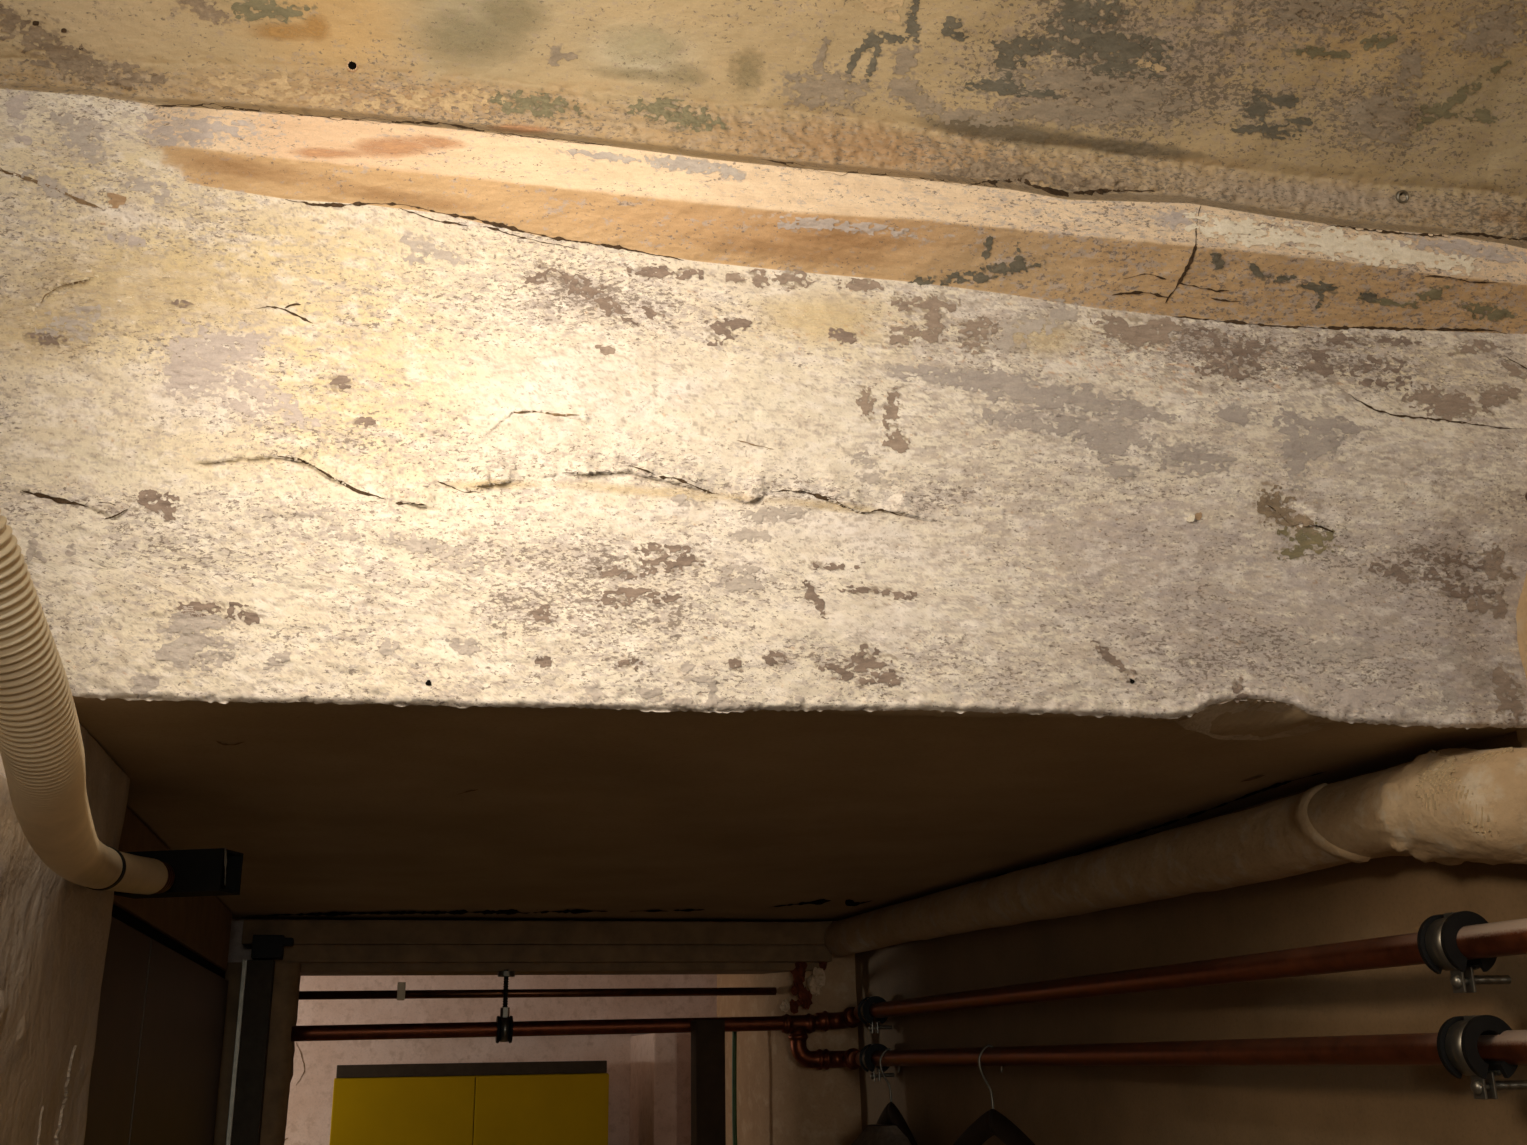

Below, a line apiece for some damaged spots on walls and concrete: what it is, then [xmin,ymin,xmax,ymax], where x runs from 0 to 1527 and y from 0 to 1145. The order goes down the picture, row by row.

damp [940,120,1182,156]
crack [1114,206,1527,369]
crack [511,409,577,417]
crack [1352,396,1512,429]
crack [278,456,479,506]
crack [564,465,716,494]
crack [771,489,902,516]